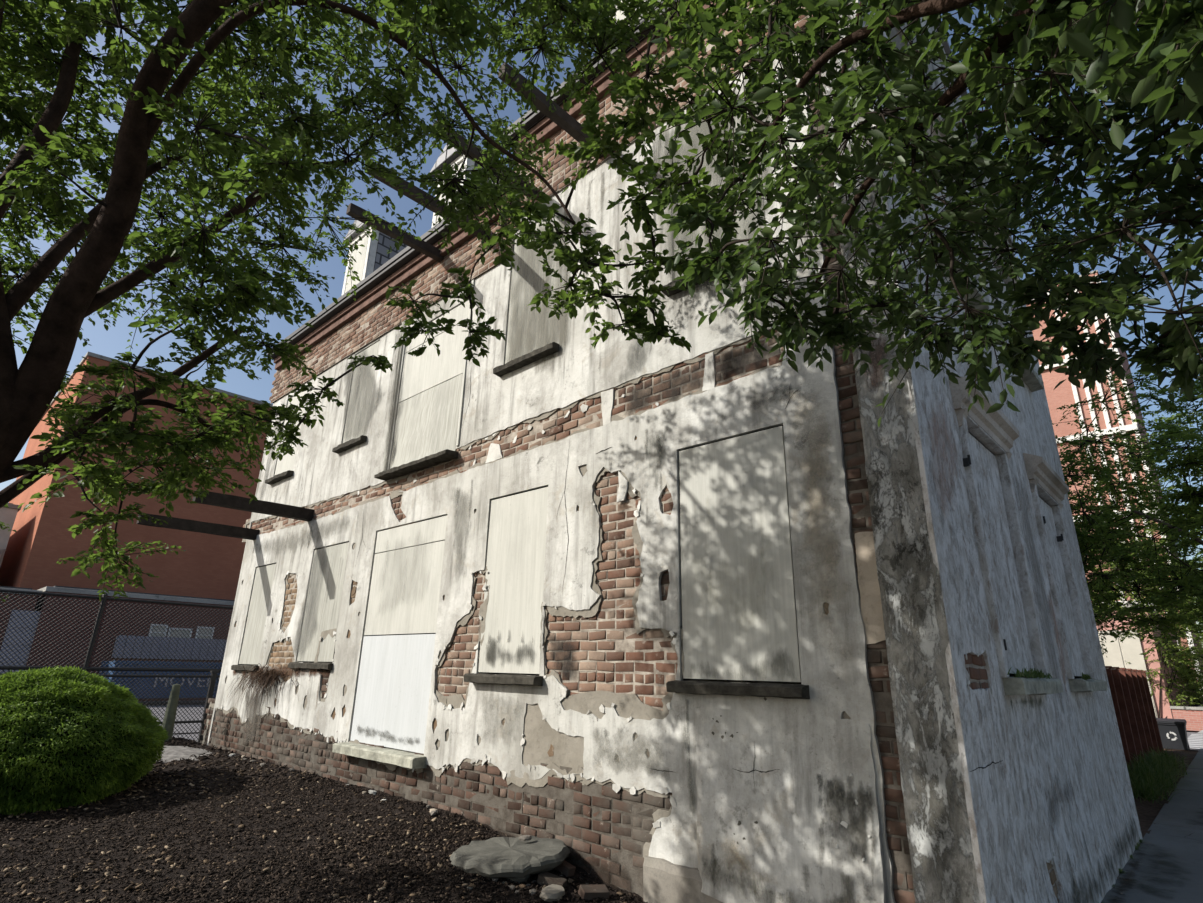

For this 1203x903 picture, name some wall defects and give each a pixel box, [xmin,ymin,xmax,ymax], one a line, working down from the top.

flaking render [806,58,828,138]
flaking render [242,329,784,542]
flaking render [267,571,351,719]
flaking render [350,581,360,615]
flaking render [433,565,490,749]
flaking render [540,465,684,740]
flaking render [815,153,915,903]
flaking render [964,653,992,694]
peeling [0,698,677,903]
leakage [817,775,876,855]